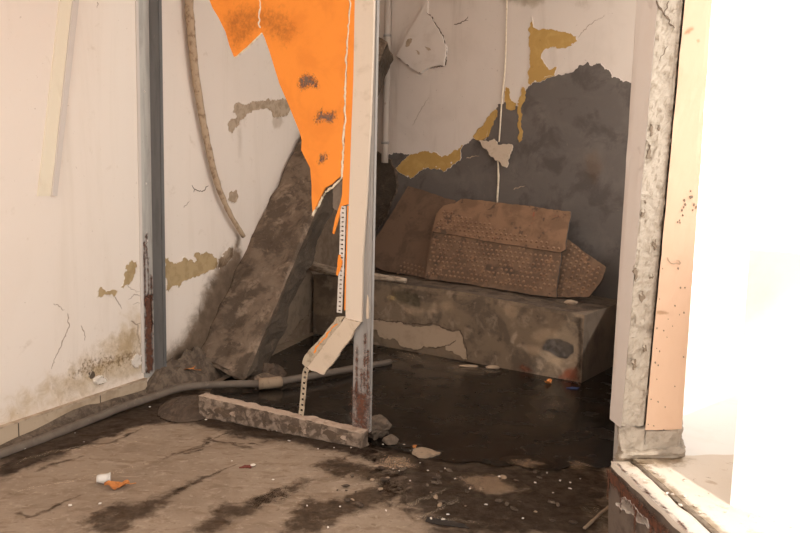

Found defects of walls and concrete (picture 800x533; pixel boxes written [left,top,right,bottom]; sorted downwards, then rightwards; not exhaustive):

peeling [227,98,290,134]
peeling [375,17,631,300]
peeling [97,260,139,298]
corrosion [143,233,154,373]
peeling [165,247,234,292]
crack [51,304,86,369]
spalling [373,318,468,361]
corrosion [350,334,371,429]